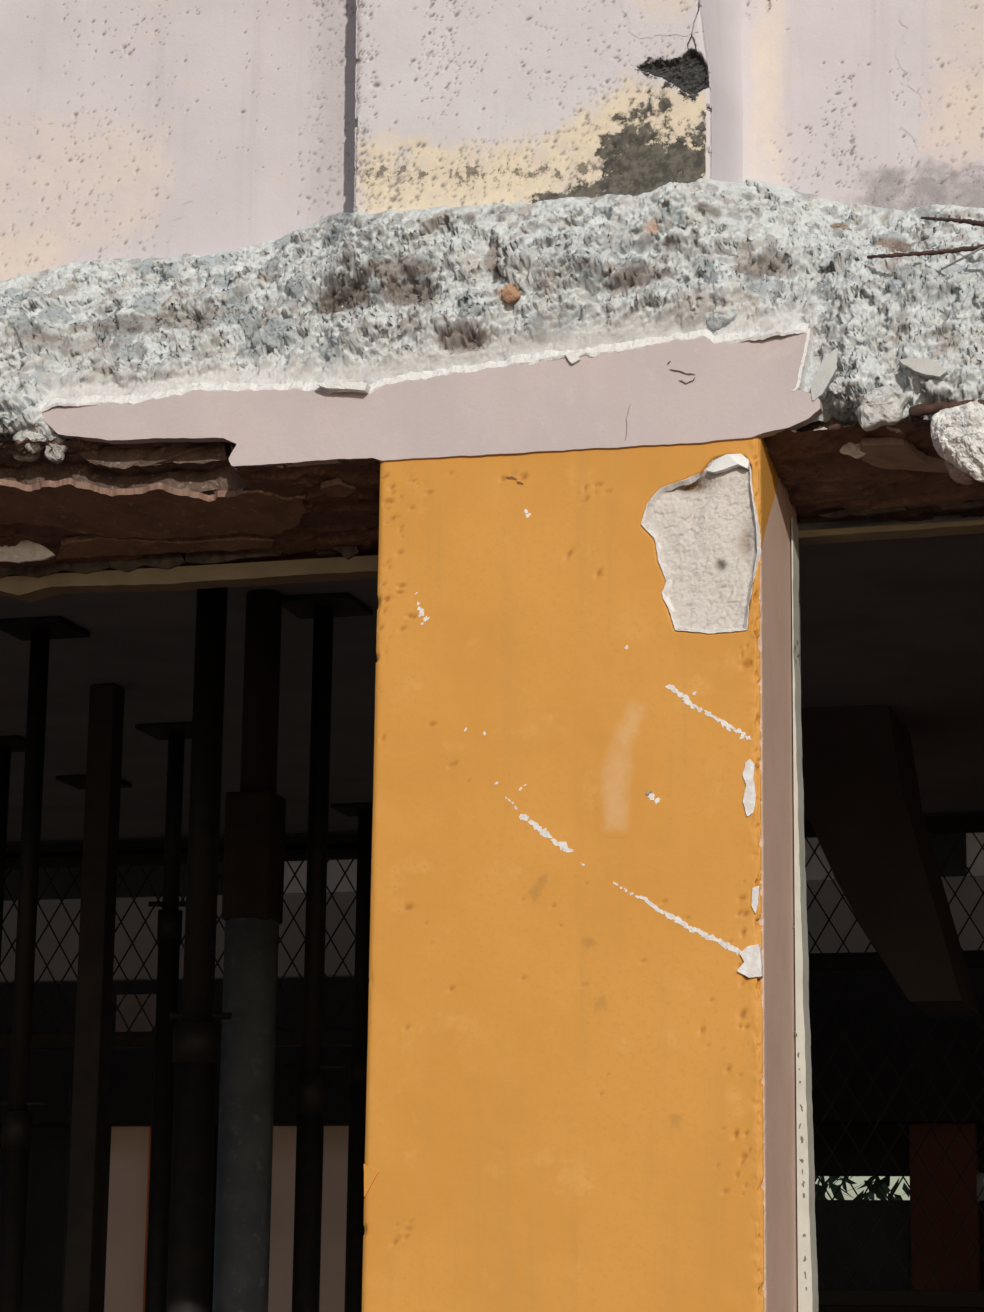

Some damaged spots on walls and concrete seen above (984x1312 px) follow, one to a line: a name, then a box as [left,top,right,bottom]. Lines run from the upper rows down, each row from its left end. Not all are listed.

water stain [287,0,706,234]
corrosion [742,0,806,194]
spalling [0,0,984,578]
spalling [641,454,761,634]
peeling [494,782,585,866]
peeling [665,684,751,740]
peeling [743,759,756,817]
flaking render [613,881,763,978]